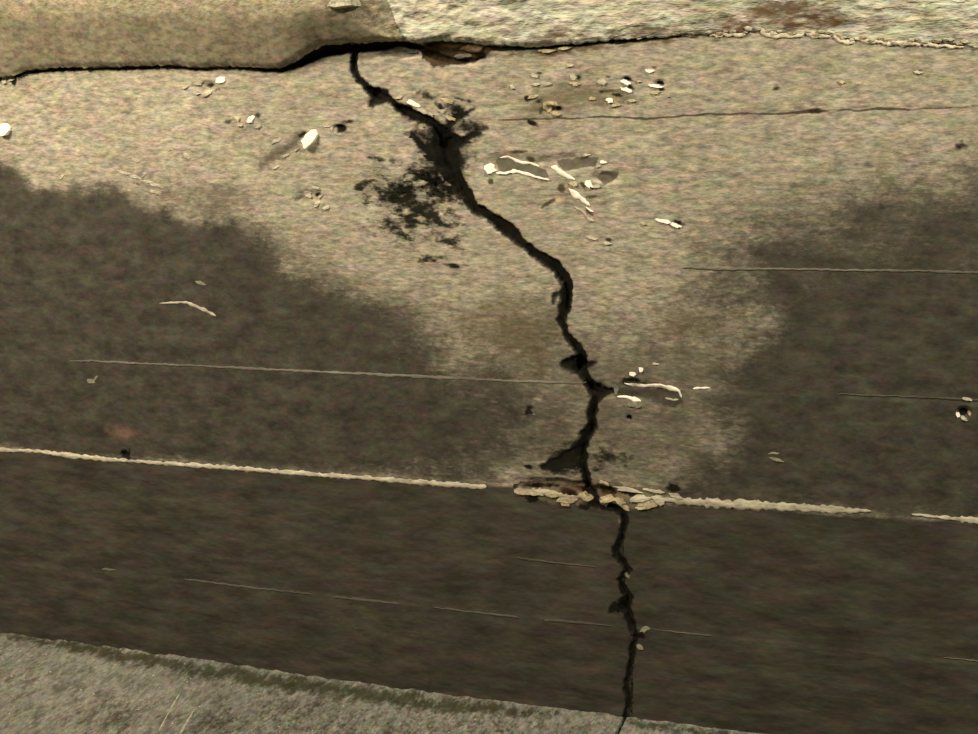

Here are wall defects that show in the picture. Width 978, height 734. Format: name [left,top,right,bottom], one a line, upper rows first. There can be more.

crack [461,35,696,64]
water stain [443,104,482,159]
crack [499,107,966,120]
water stain [354,130,464,250]
peeling [484,150,618,222]
peeling [641,218,682,228]
crack [0,41,638,719]
spalling [613,362,682,419]
water stain [0,165,978,734]
spalling [514,479,683,511]